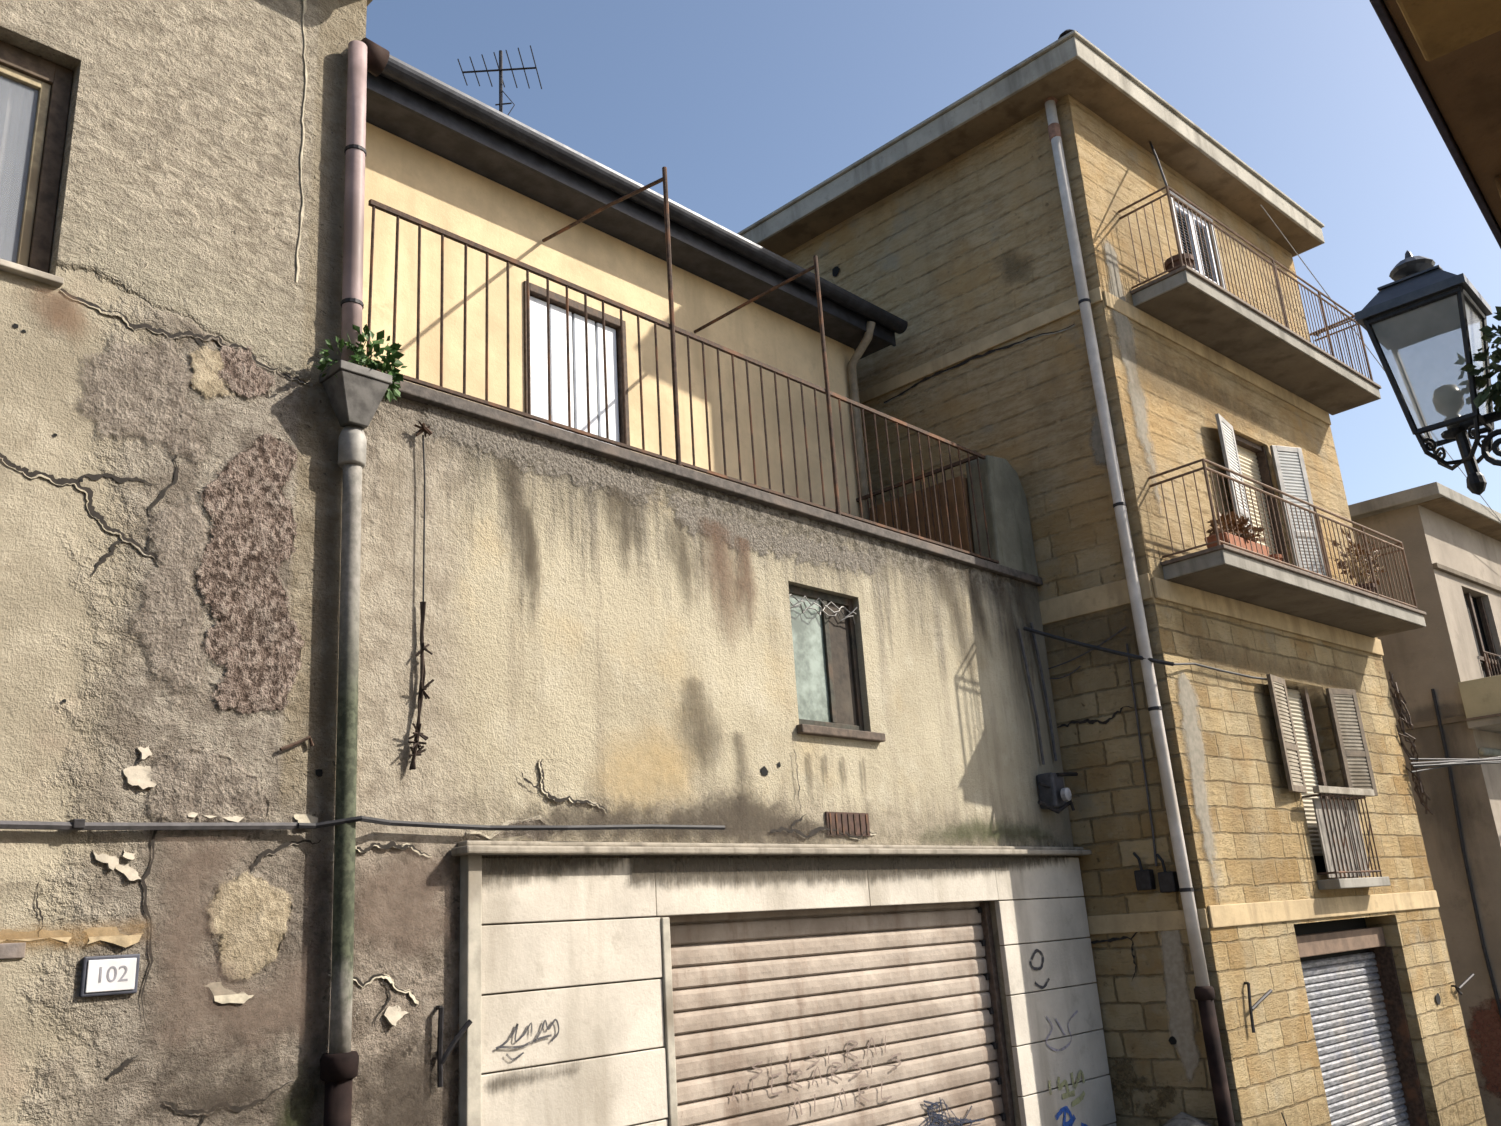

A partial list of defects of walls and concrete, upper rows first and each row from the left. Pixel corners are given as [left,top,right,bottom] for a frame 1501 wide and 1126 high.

crack [60,288,311,393]
crack [884,324,1075,404]
crack [0,449,187,592]
flaking render [79,336,305,720]
flaking render [93,850,141,881]
flaking render [0,926,143,948]
flaking render [203,869,295,1004]